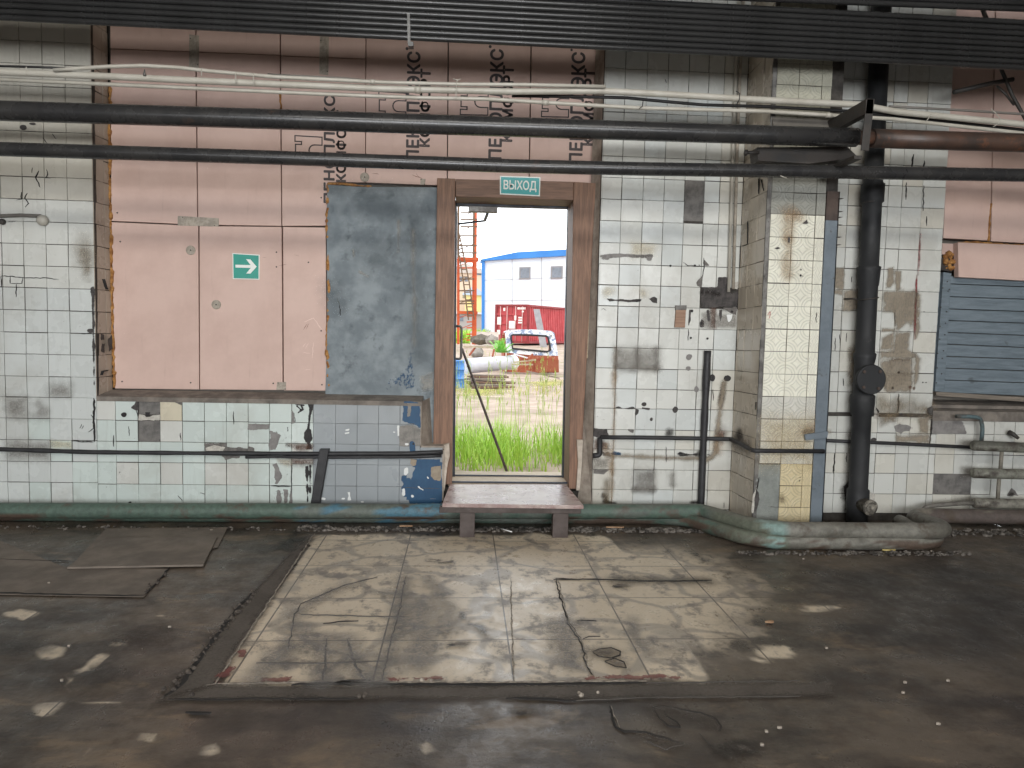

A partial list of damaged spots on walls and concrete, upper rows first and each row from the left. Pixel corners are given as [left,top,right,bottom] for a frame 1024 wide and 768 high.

spalling [669,260,738,340]
peeling [121,402,161,442]
peeling [387,352,450,504]
crack [157,532,800,750]